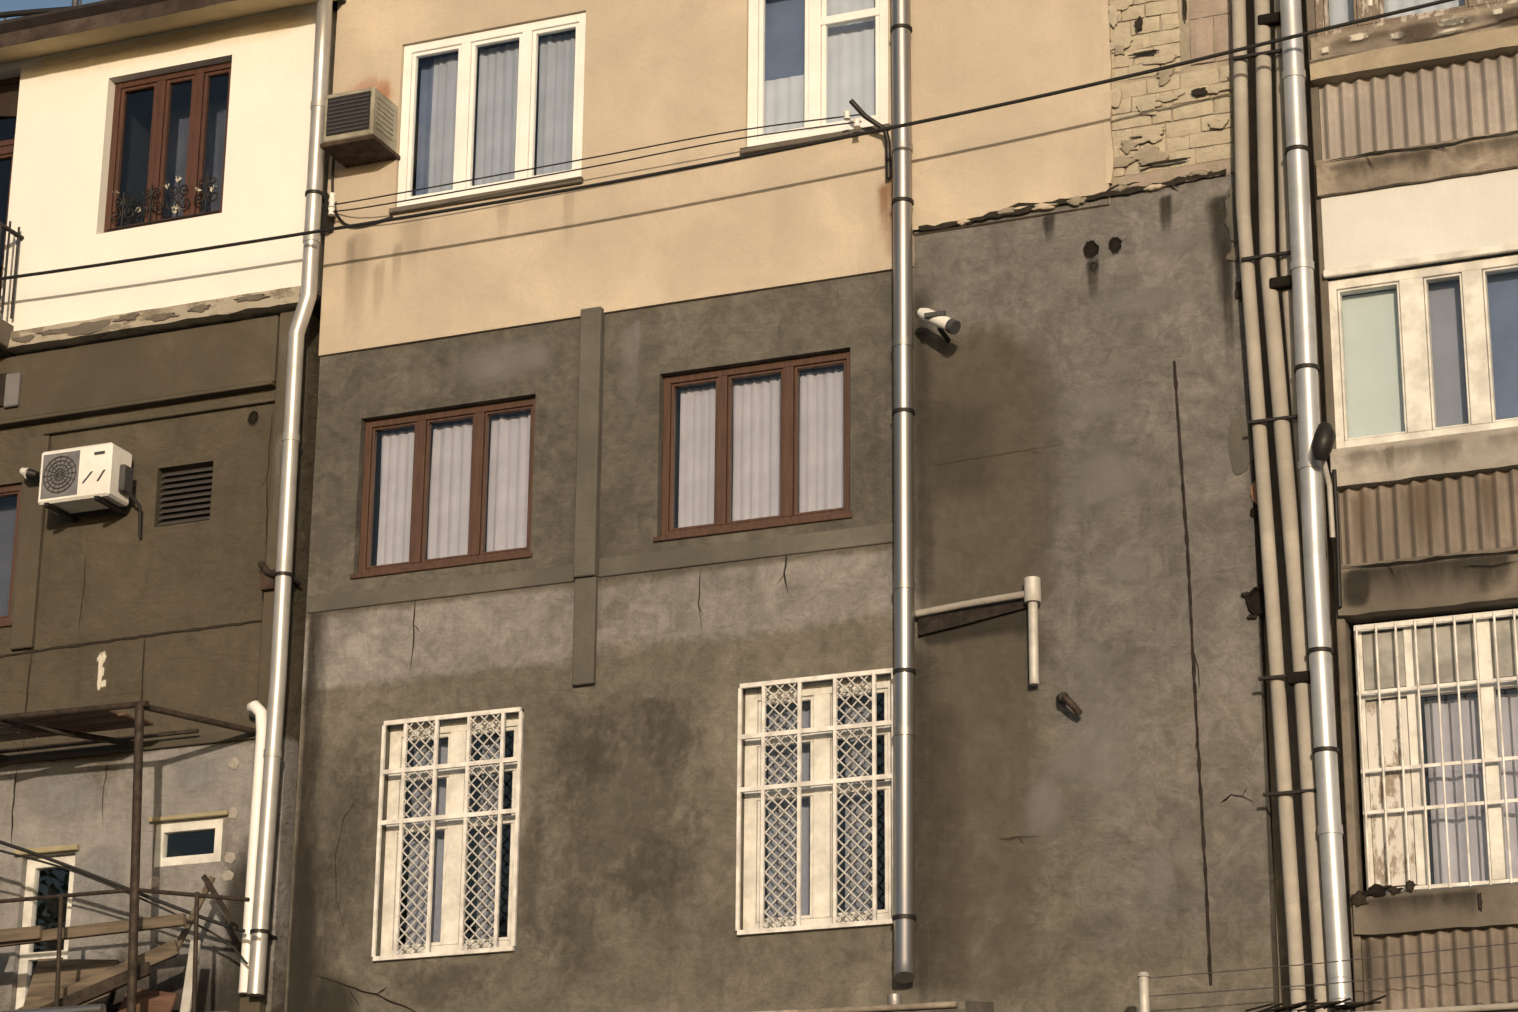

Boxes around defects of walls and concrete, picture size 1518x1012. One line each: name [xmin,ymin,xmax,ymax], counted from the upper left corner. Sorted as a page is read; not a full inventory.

spalling [1083,236,1126,283]
peeling [1101,0,1243,302]